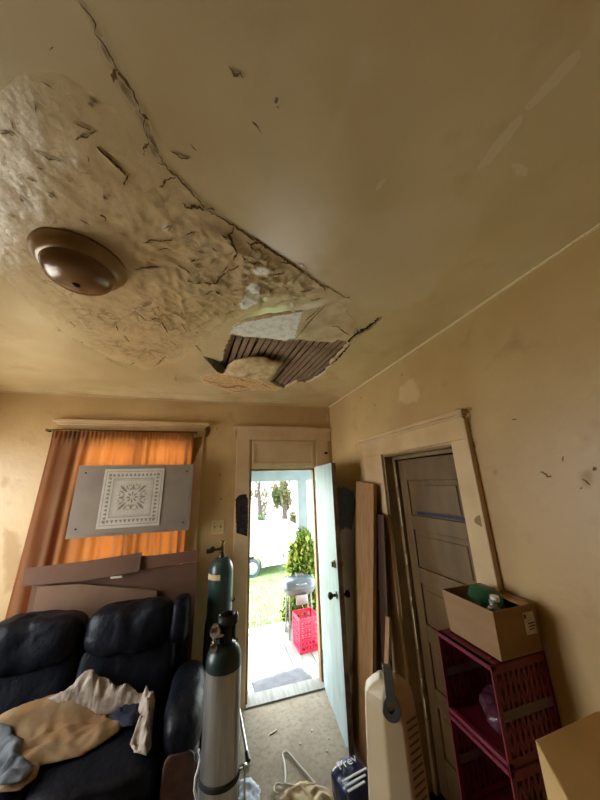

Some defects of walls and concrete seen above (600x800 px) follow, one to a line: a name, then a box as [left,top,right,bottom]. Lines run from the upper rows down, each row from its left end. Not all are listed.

crack [77,1,350,298]
peeling [134,225,172,271]
peeling [177,235,356,393]
crack [332,317,381,364]